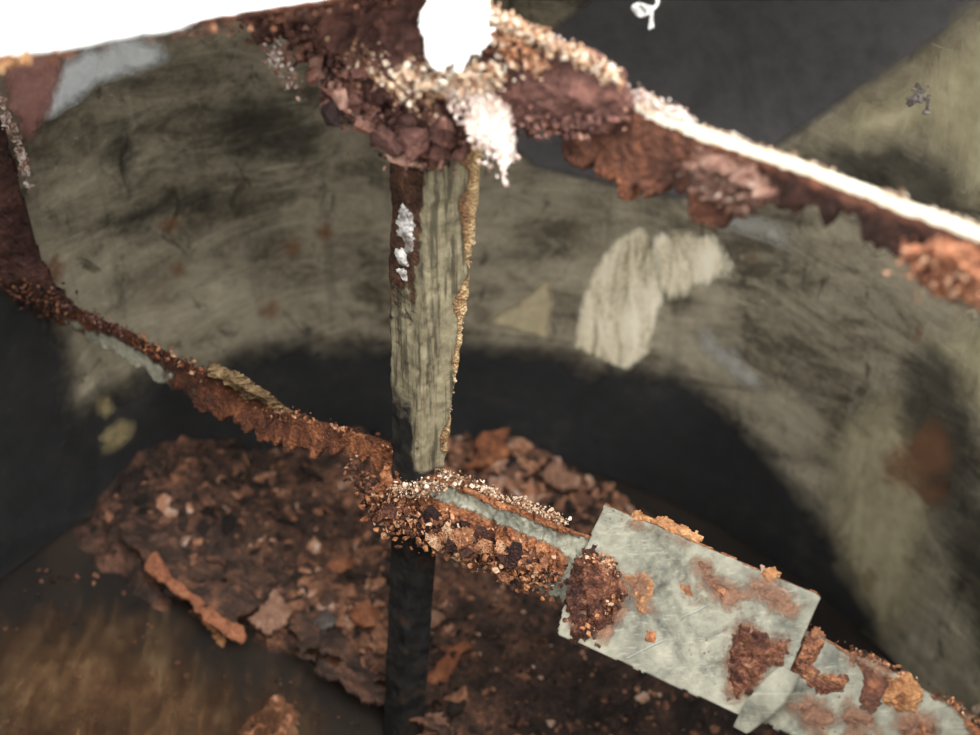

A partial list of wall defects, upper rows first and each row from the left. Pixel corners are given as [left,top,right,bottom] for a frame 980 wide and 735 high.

corrosion [4,52,62,134]
corrosion [666,161,769,214]
corrosion [884,235,980,310]
corrosion [207,361,294,413]
corrosion [626,510,704,543]
corrosion [562,544,654,654]
corrosion [680,557,800,617]
corrosion [645,630,657,643]
corrosion [724,621,938,735]